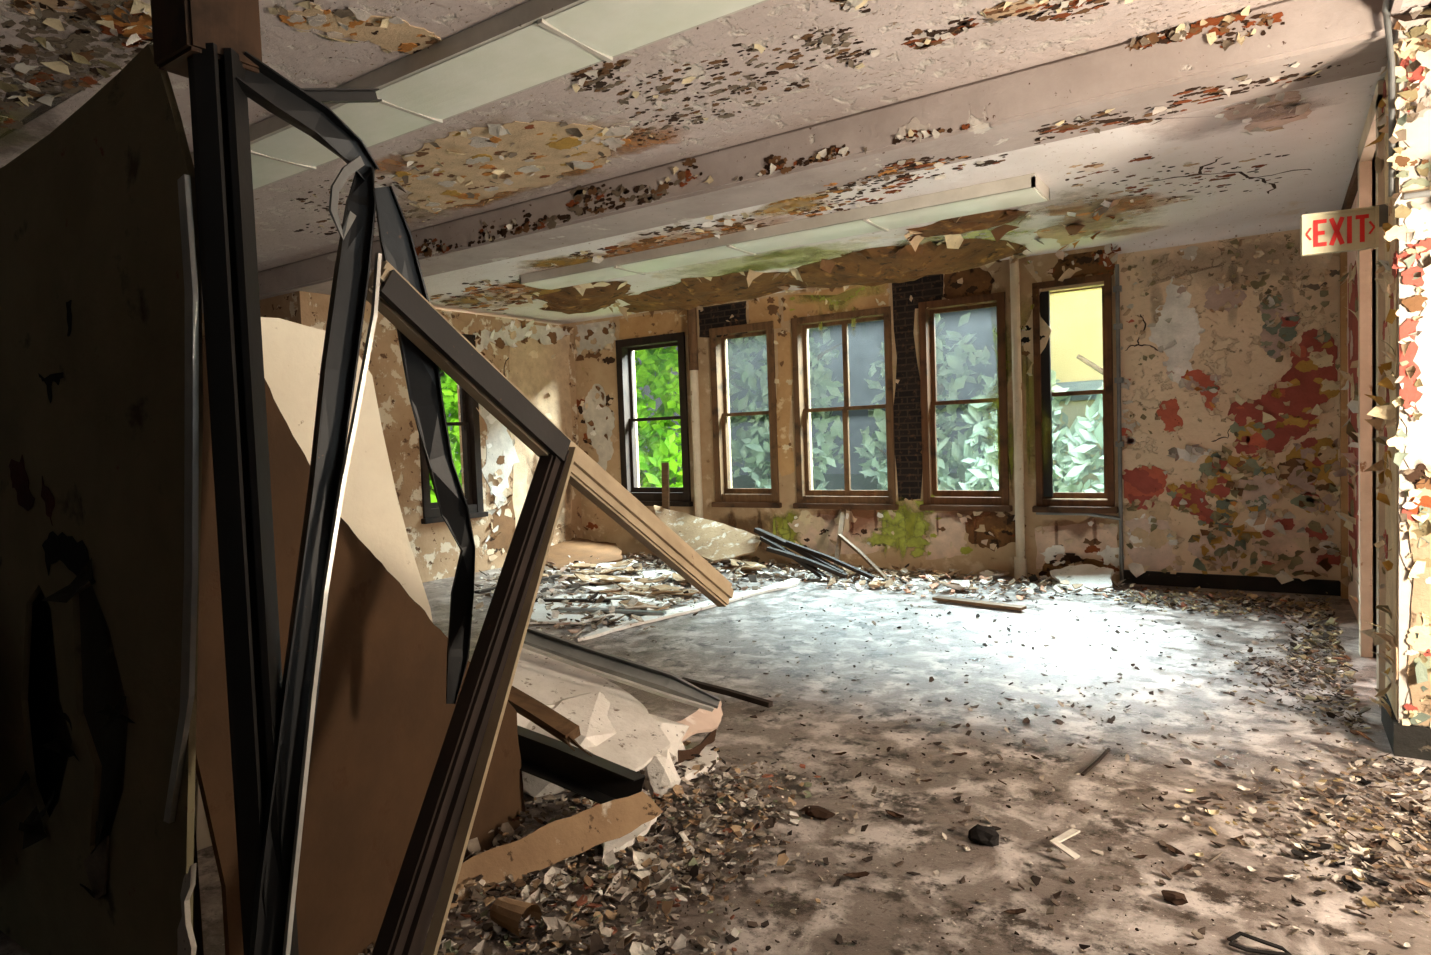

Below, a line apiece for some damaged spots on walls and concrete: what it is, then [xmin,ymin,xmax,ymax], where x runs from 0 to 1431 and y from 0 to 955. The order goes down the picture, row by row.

peeling [268,0,442,56]
peeling [0,0,153,130]
peeling [289,179,353,235]